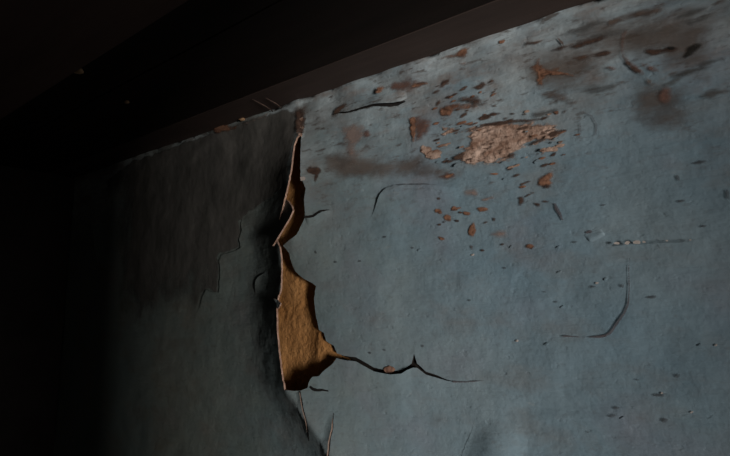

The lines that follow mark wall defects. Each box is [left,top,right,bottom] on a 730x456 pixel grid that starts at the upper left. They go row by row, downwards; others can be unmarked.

flaking render [421,80,566,205]
crack [304,210,333,226]
flaking render [435,191,492,225]
peeling [108,110,360,422]
crack [563,266,630,338]
crack [342,355,477,383]